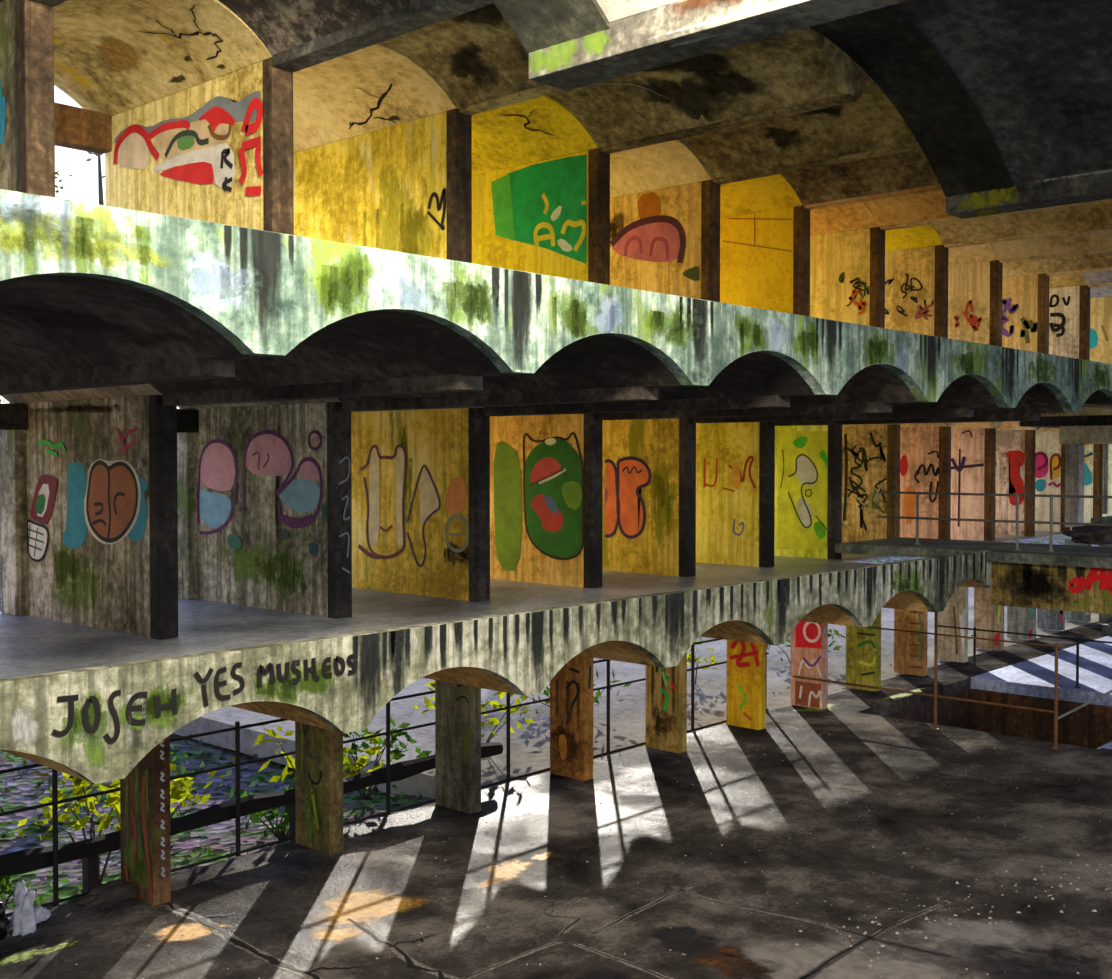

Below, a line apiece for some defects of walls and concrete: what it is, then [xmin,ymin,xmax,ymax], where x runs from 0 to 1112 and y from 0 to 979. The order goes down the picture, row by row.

crack [137,5,223,60]
crack [349,84,396,129]
damp [24,209,36,274]
damp [75,217,94,272]
damp [136,225,150,283]
damp [224,225,294,336]
damp [321,265,363,317]
damp [363,209,380,249]
damp [1022,564,1085,592]
damp [353,552,987,706]